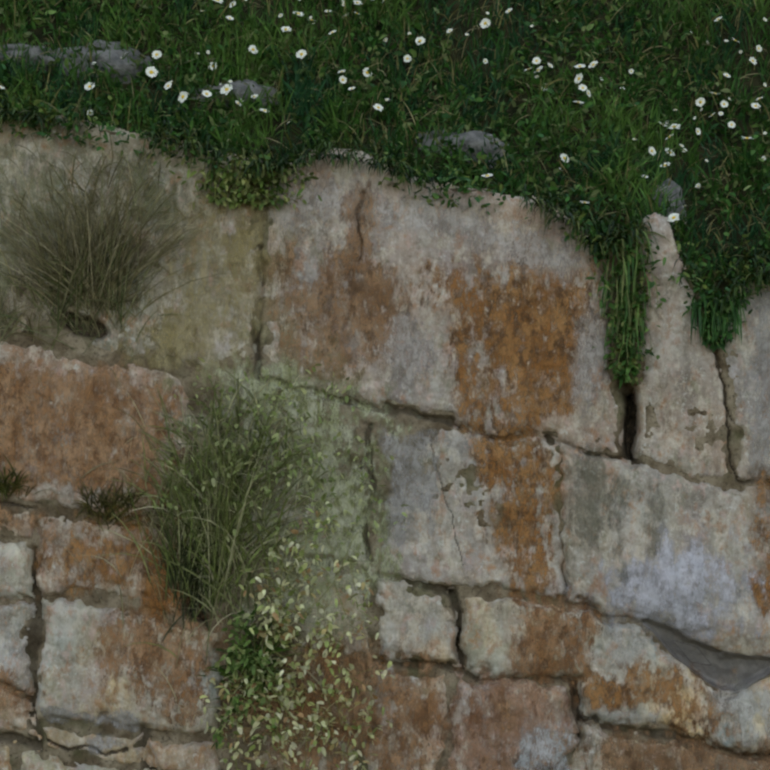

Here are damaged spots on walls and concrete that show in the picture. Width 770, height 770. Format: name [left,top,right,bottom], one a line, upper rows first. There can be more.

crack [430,443,464,565]
crack [47,739,128,757]